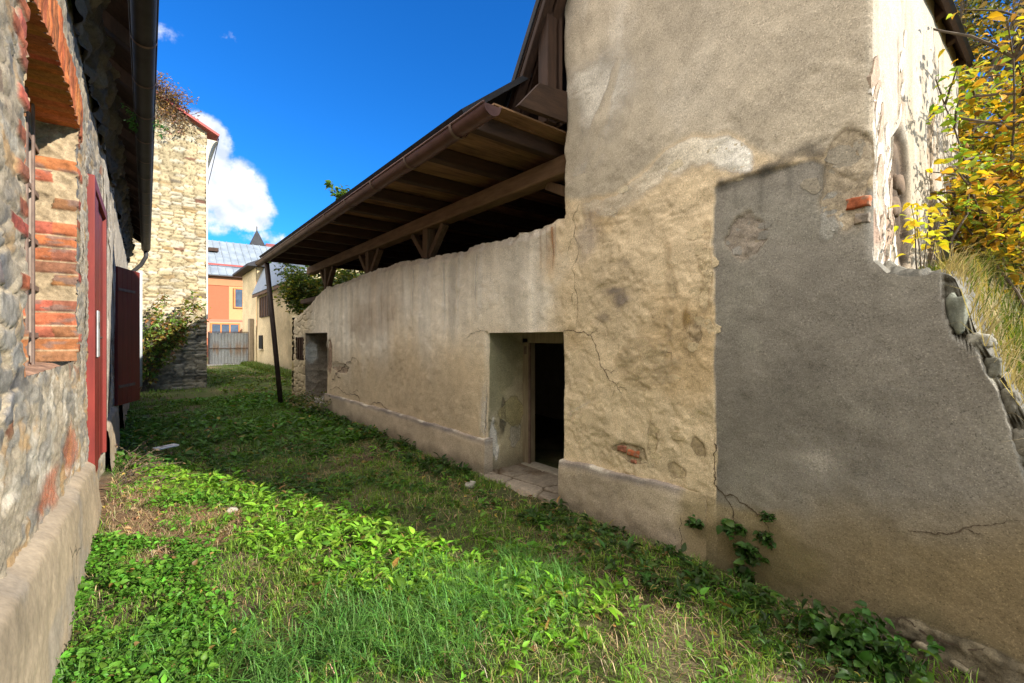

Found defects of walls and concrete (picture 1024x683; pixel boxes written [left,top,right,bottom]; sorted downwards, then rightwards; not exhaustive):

flaking render [800,29,906,266]
crack [564,205,625,397]
flaking render [328,339,349,373]
flaking render [606,422,705,478]
crack [713,439,776,533]
crack [908,520,1022,535]